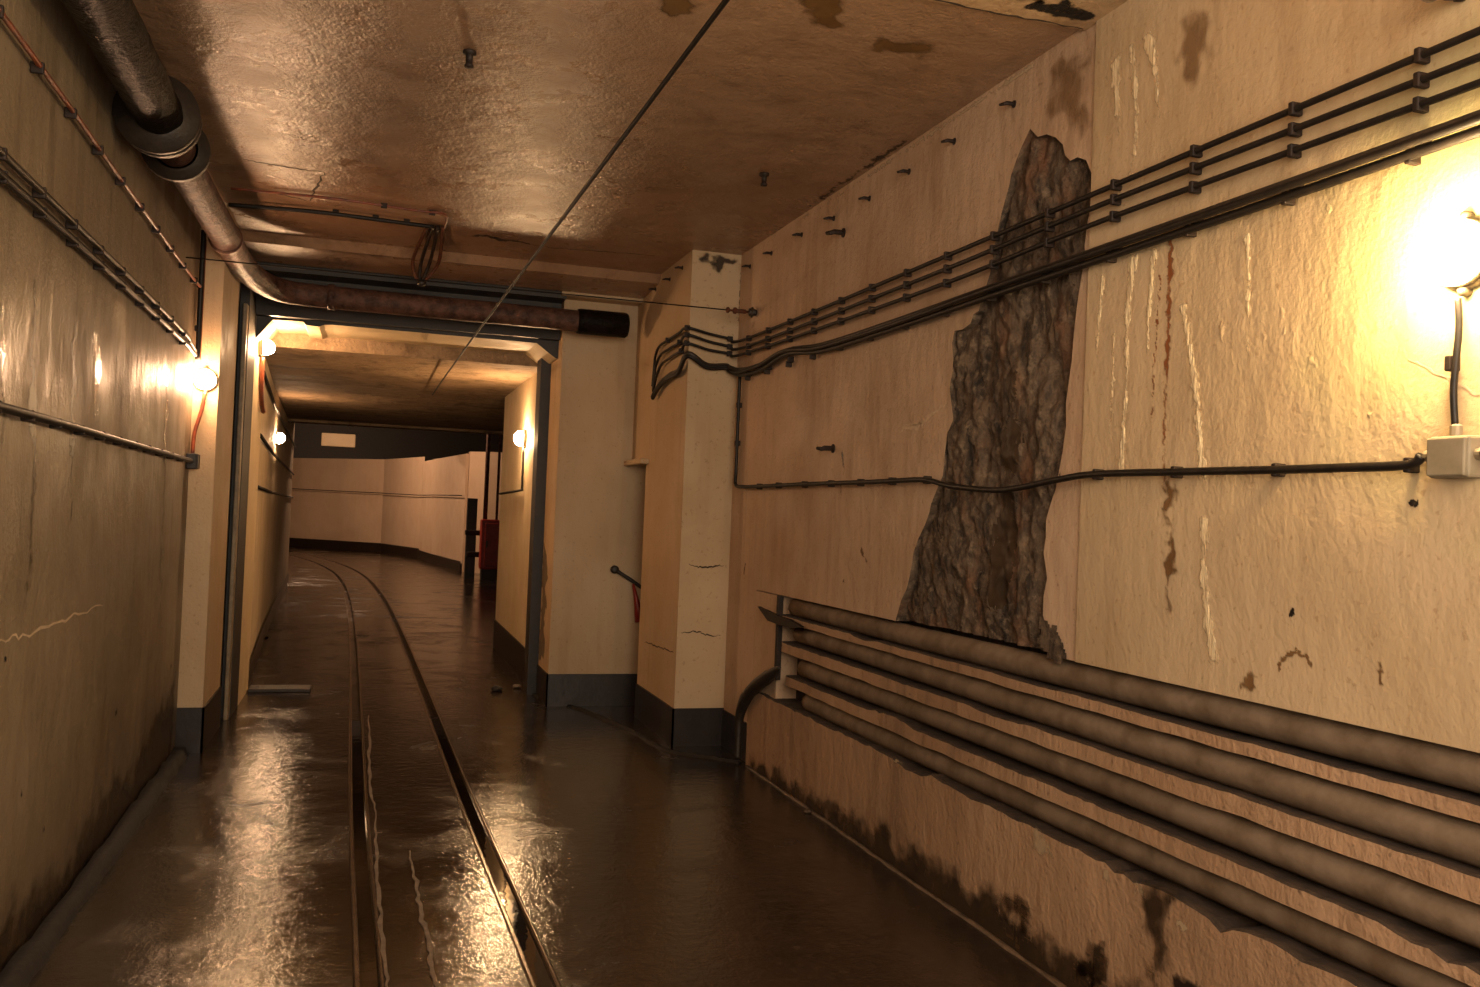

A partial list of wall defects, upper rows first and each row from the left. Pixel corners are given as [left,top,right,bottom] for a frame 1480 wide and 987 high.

damp [661,0,694,16]
damp [801,0,843,28]
damp [874,38,931,53]
damp [1183,18,1206,80]
spalling [905,133,1091,664]
damp [751,762,1108,987]
damp [1143,886,1197,987]